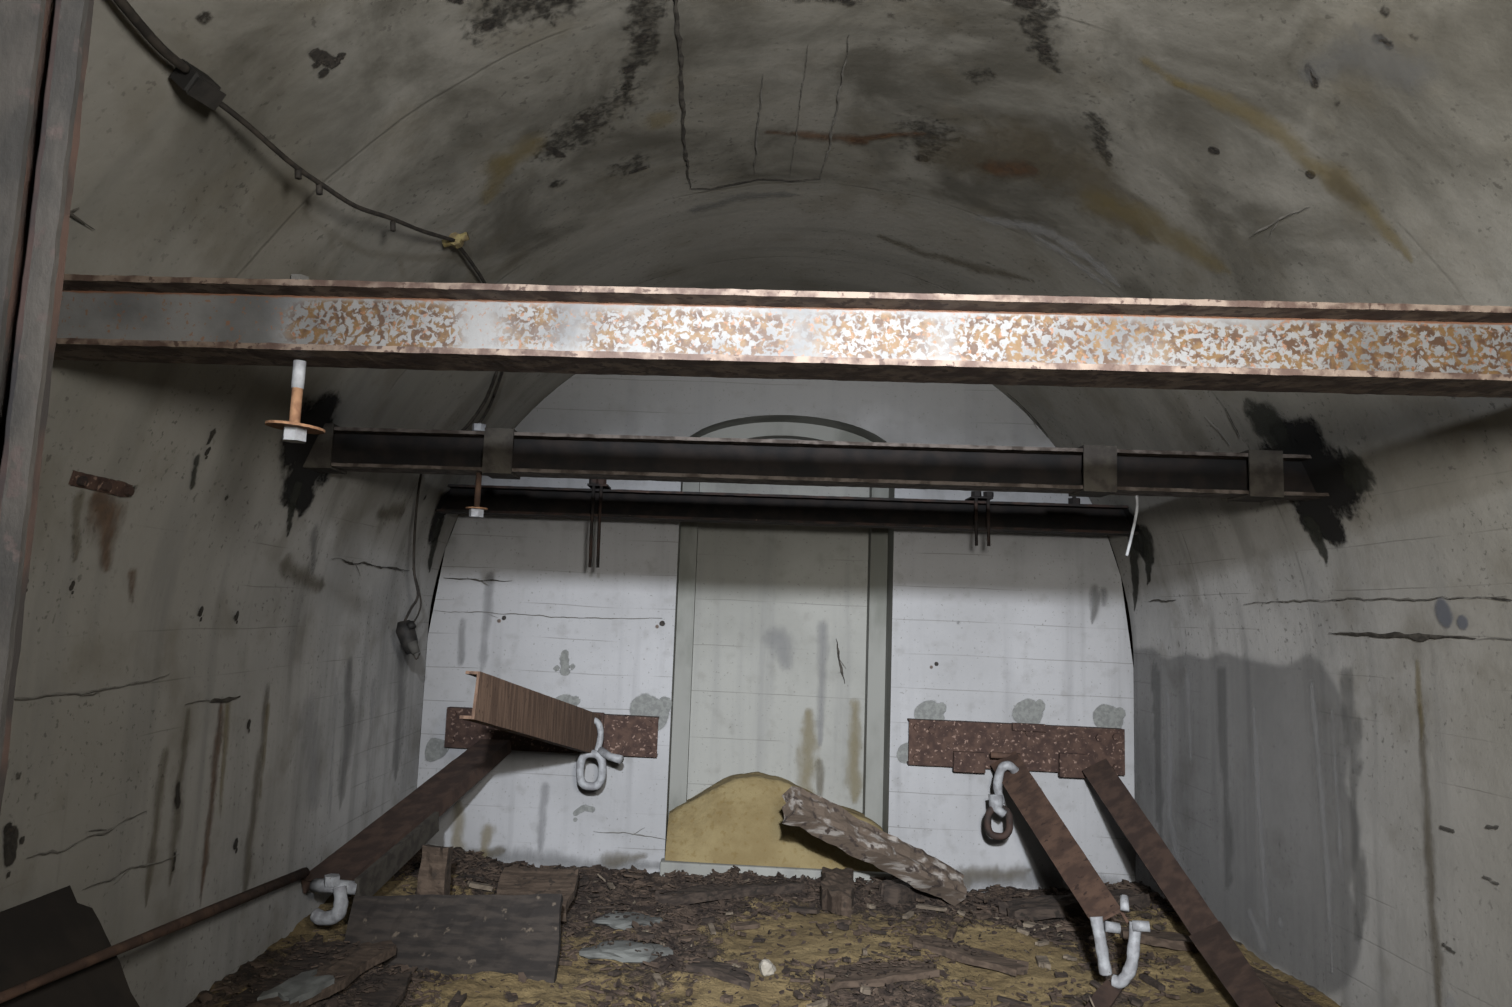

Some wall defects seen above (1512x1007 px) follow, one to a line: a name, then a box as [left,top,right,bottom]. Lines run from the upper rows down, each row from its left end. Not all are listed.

crack [674,0,849,189]
damp [287,481,303,537]